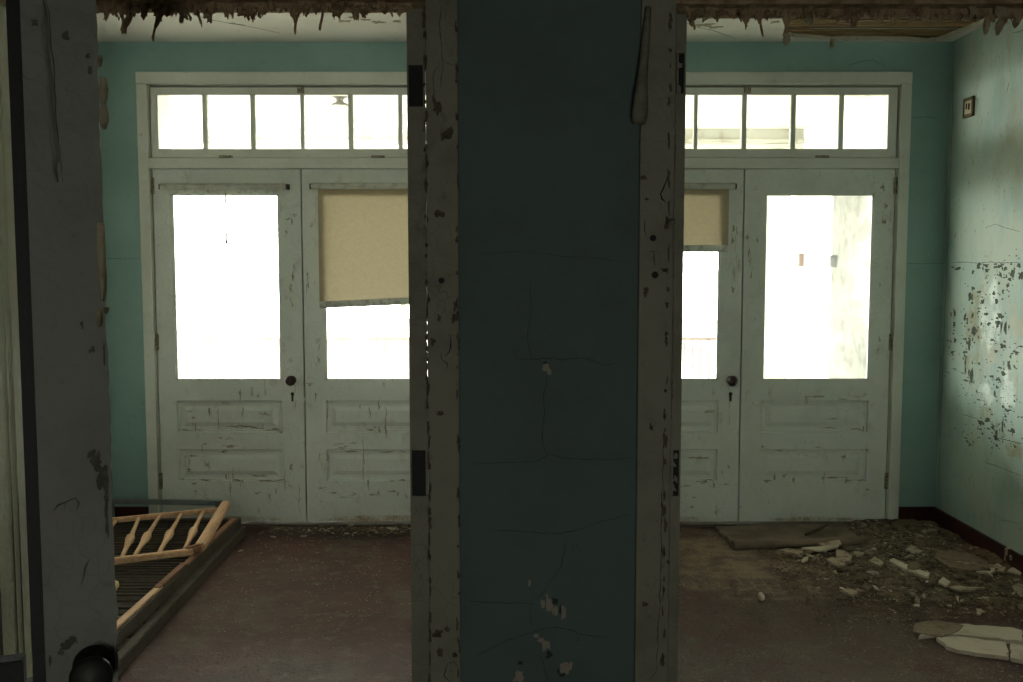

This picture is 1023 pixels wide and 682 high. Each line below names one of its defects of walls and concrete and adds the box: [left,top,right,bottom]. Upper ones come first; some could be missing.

peeling [96,0,427,41]
spalling [668,6,1023,49]
peeling [945,249,1023,449]
peeling [87,449,109,538]